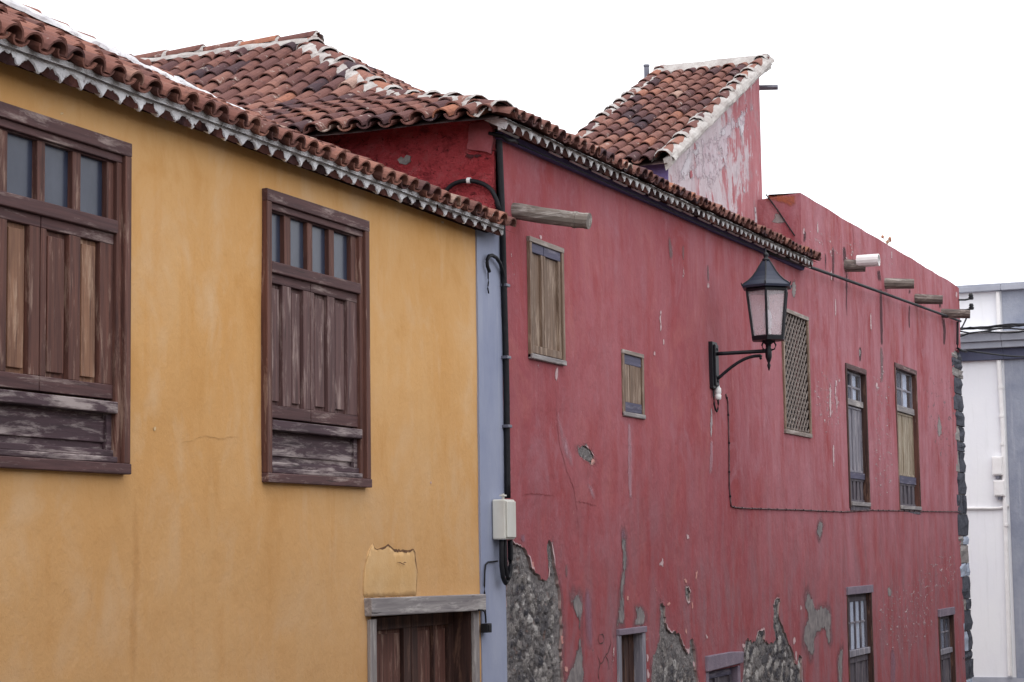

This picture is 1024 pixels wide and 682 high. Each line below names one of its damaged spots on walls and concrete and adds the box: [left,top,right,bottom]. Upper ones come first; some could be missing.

peeling [678,99,747,187]
flaking render [578,444,595,465]
flaking render [506,540,584,682]
flaking render [646,602,699,682]
flaking render [742,589,832,682]